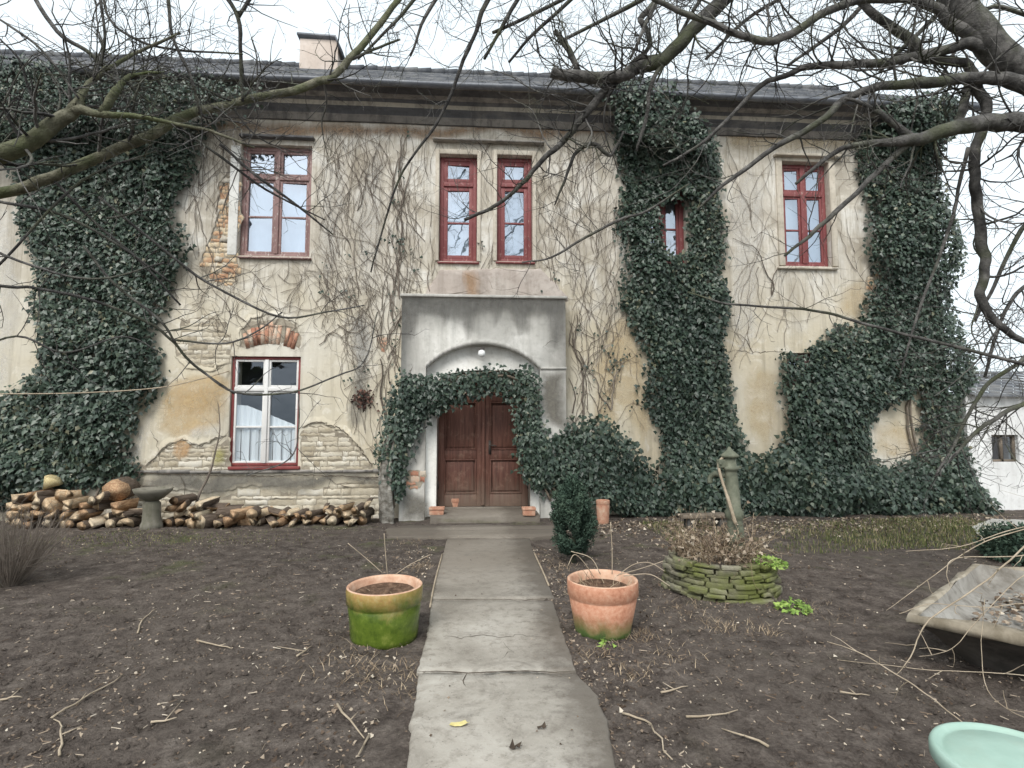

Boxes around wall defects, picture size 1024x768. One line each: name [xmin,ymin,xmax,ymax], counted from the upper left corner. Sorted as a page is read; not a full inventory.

flaking render [198,171,244,286]
spalling [174,310,306,373]
spalling [126,416,379,519]